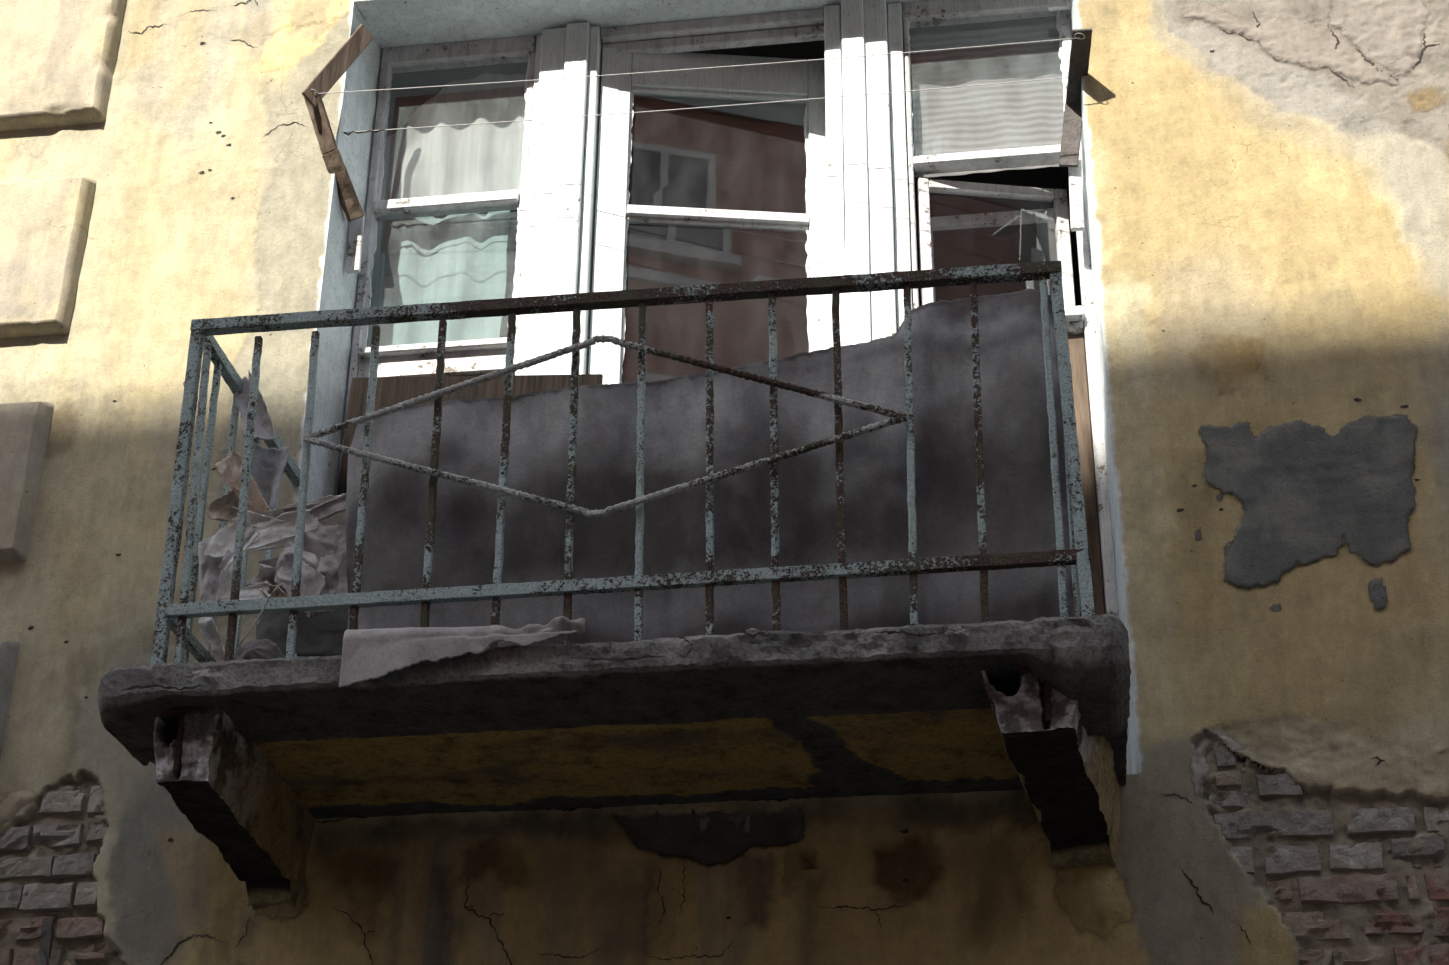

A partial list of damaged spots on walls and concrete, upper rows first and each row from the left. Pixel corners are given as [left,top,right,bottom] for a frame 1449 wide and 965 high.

crack [1219,12,1288,62]
peeling [1183,0,1429,85]
crack [1321,24,1439,87]
spalling [0,785,108,965]
spalling [614,808,804,866]
spalling [1207,741,1449,965]
crack [331,906,374,965]
crack [464,871,603,965]
crack [648,942,735,960]
crack [819,903,913,928]